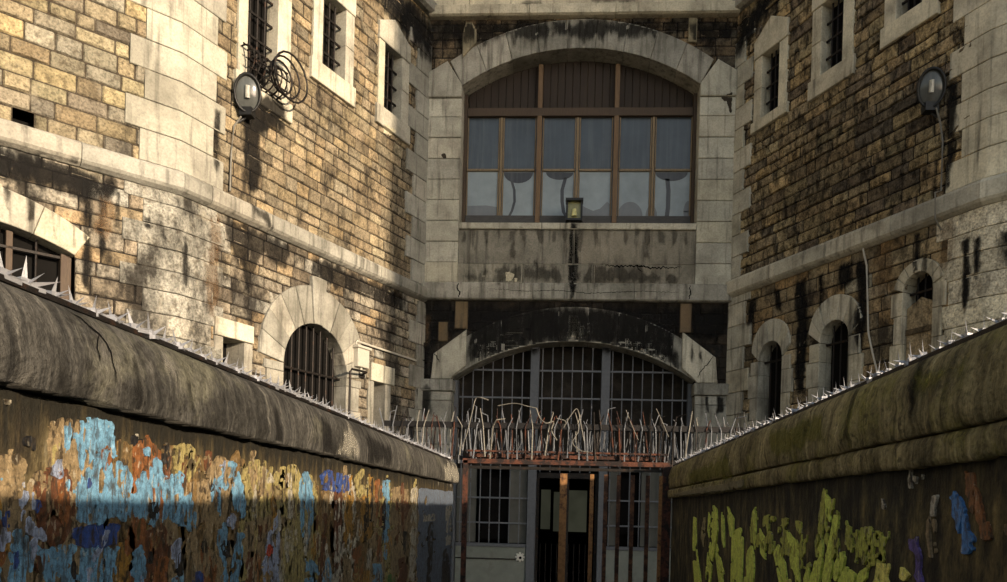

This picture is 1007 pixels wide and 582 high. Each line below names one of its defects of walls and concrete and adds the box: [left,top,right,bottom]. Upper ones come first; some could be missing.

water stain [0,149,120,290]
water stain [568,223,579,299]
water stain [747,299,755,326]
water stain [774,289,782,310]
water stain [795,277,807,393]
water stain [838,261,869,351]
water stain [913,233,927,273]
water stain [961,237,980,309]
water stain [705,396,724,413]